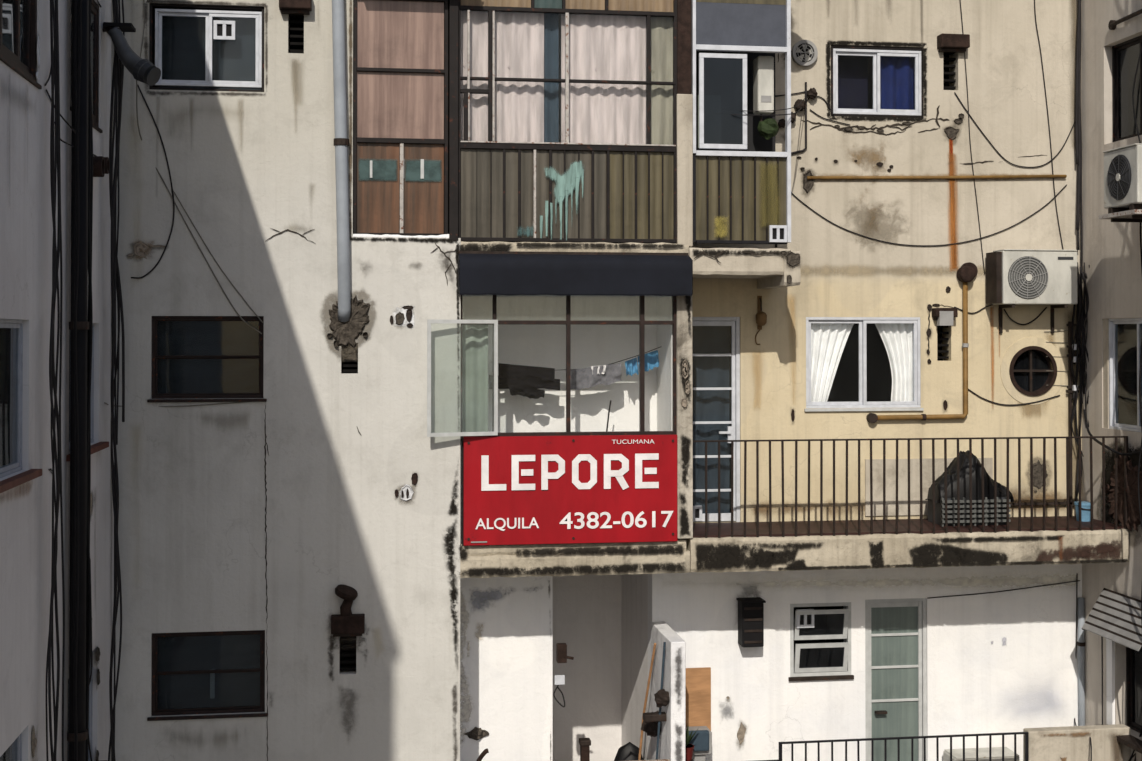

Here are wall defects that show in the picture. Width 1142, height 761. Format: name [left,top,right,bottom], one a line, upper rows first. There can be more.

water stain [852,151,882,169]
crack [266,228,316,244]
spalling [323,291,375,359]
spalling [390,306,414,328]